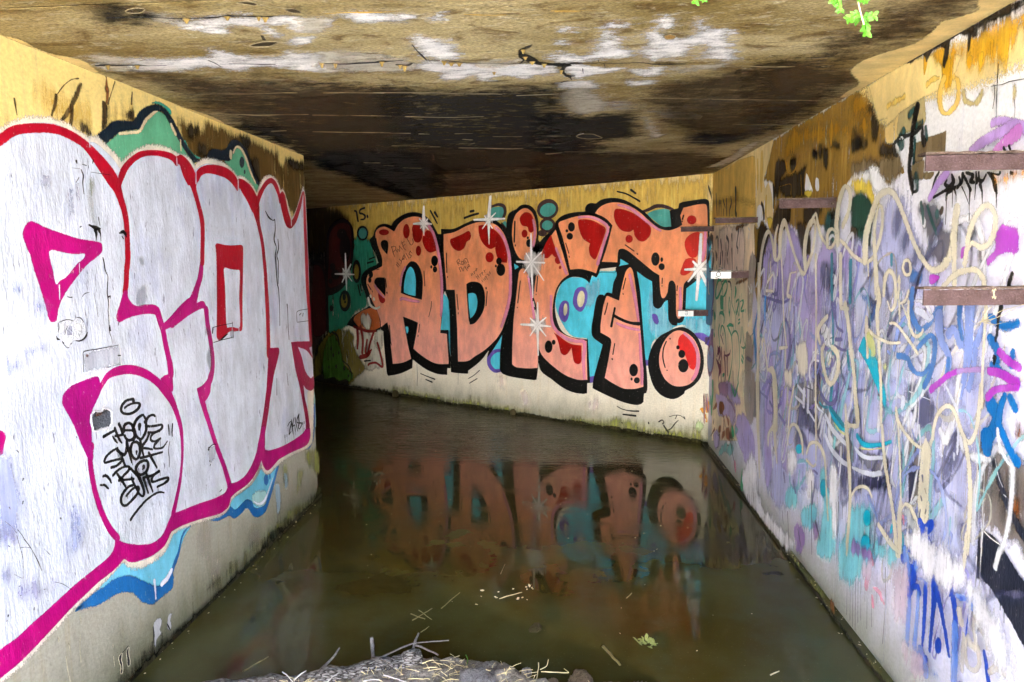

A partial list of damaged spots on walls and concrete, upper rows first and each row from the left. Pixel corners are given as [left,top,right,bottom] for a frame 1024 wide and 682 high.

crack [95,63,167,71]
damp [92,11,739,115]
crack [319,44,671,83]